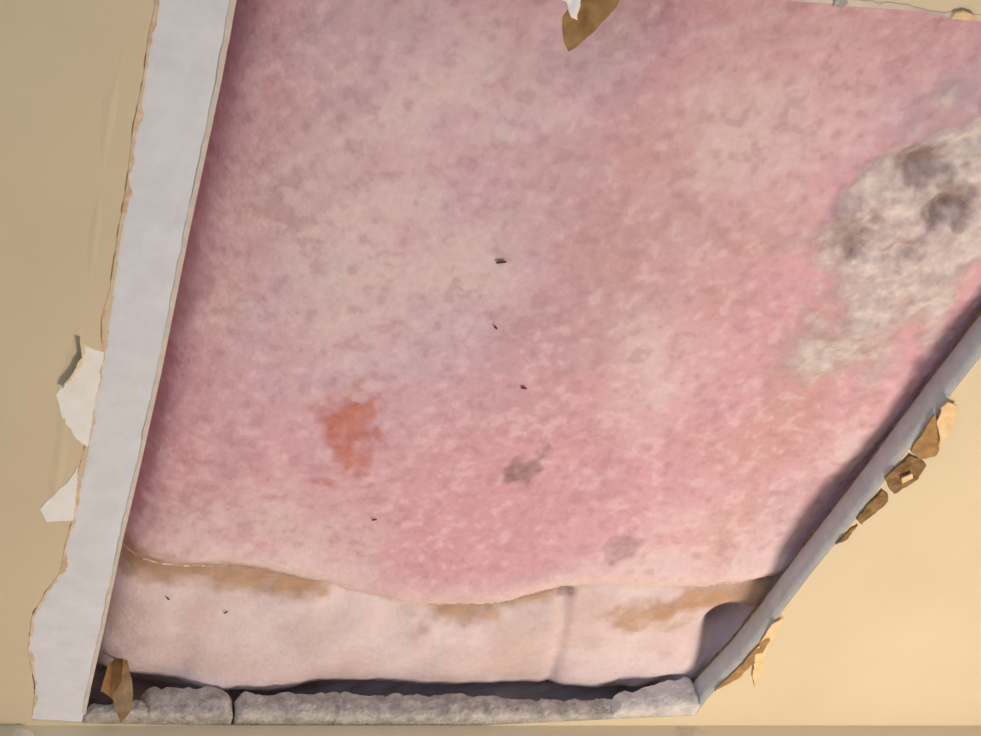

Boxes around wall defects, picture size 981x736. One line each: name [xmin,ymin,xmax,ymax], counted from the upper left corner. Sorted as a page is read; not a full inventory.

peeling [28,0,700,725]